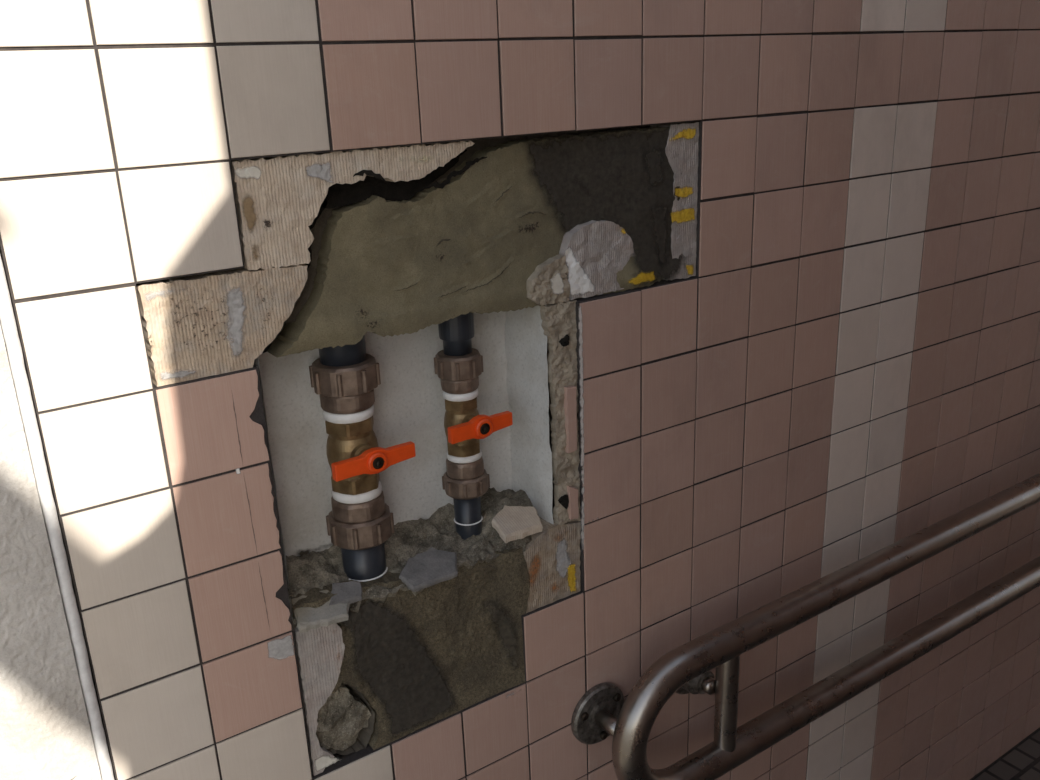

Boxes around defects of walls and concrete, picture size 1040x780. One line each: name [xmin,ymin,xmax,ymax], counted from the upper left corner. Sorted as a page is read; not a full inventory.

spalling [136,140,475,387]
spalling [650,122,699,280]
spalling [523,220,634,613]
spalling [293,623,375,776]